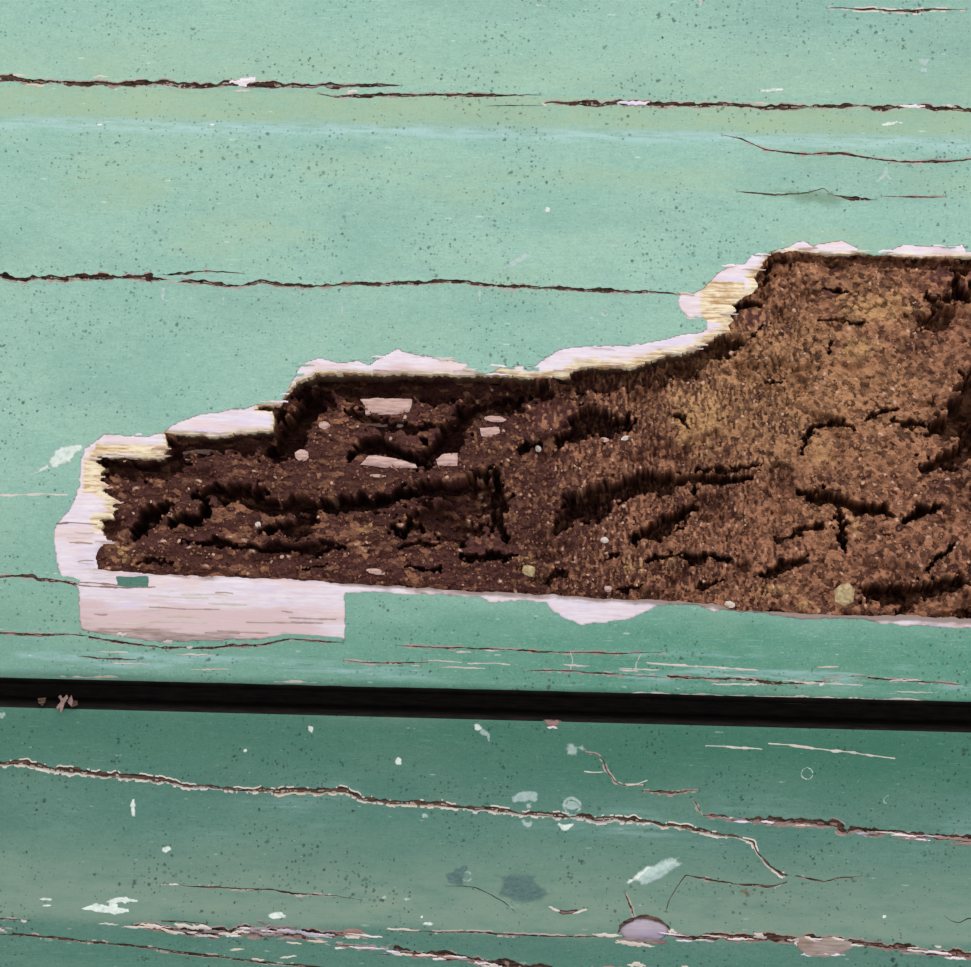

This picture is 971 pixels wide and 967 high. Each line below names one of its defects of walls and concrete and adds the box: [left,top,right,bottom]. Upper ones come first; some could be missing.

crack [827,3,967,18]
crack [0,70,971,168]
crack [737,184,946,206]
crack [0,266,680,299]
peeling [54,240,971,642]
crack [0,627,966,693]
crack [0,748,971,967]
peeling [593,914,677,947]
peeling [794,936,852,958]